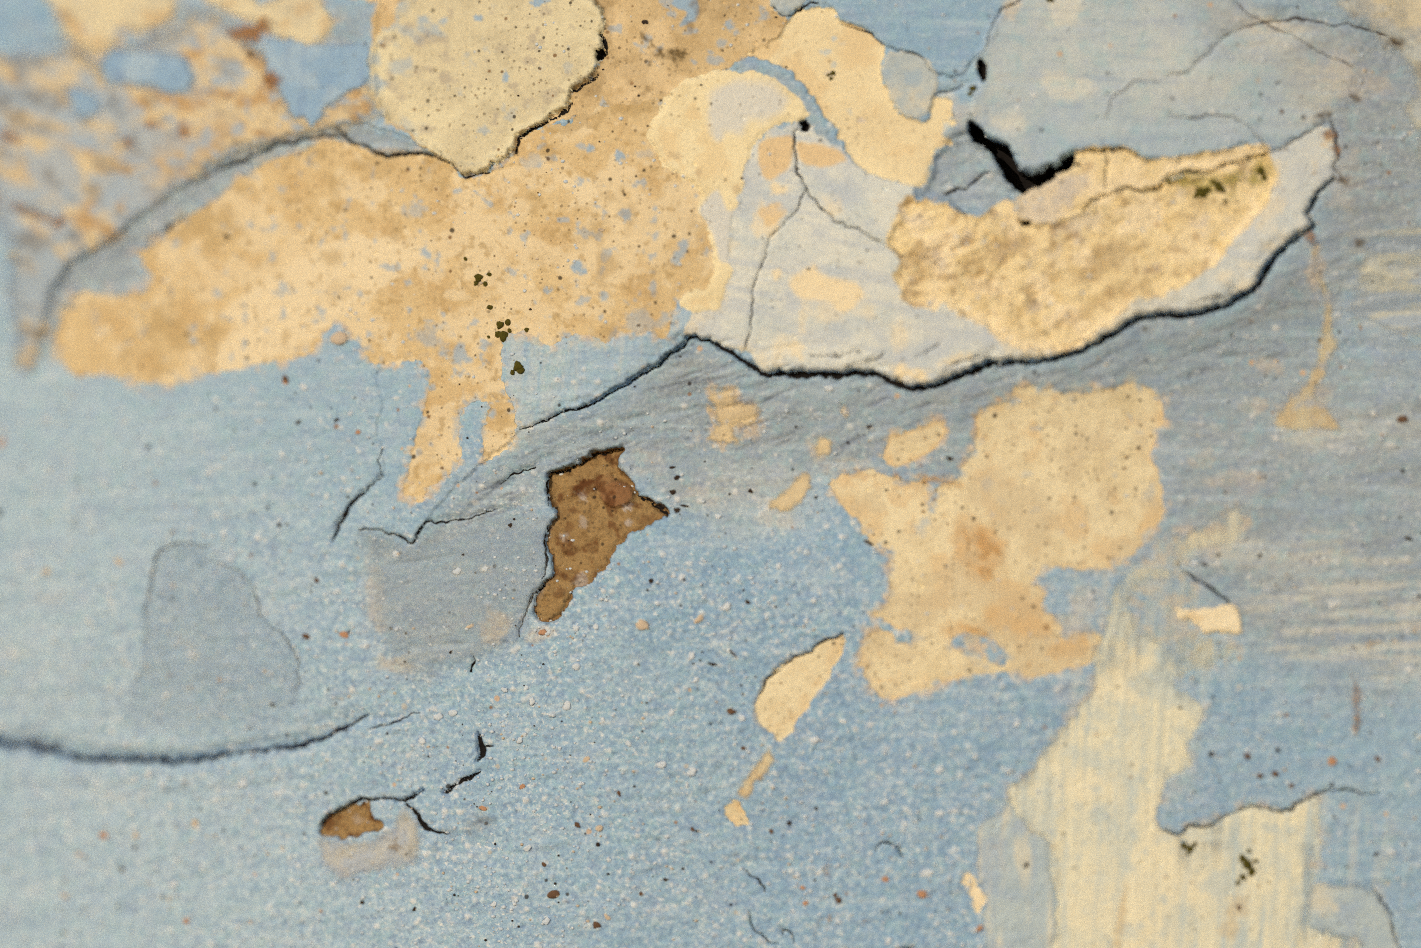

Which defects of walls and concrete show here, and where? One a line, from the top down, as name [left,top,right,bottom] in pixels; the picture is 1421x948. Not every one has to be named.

crack [55,34,608,288]
peeling [0,0,1075,503]
crack [522,0,1401,429]
crack [0,712,420,765]
flaking render [320,801,418,877]
crack [332,448,623,637]
flaking render [534,447,670,622]
crack [638,494,669,517]
peeling [724,380,1399,948]
crack [1178,564,1230,604]
crack [1162,788,1381,835]
crack [1372,886,1401,948]